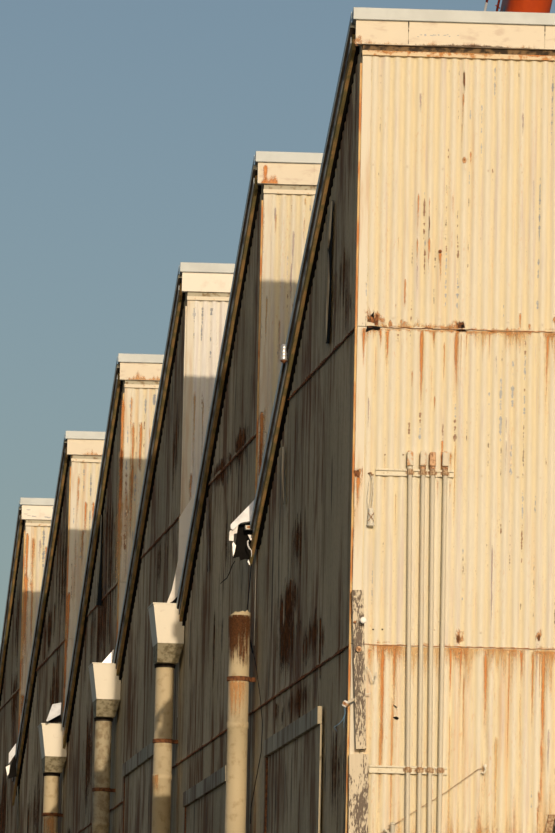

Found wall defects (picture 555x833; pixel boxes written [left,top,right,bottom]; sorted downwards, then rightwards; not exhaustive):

corrosion [287,315,555,400]
corrosion [85,402,150,669]
corrosion [0,533,35,722]
corrosion [36,521,70,709]
corrosion [213,615,251,671]
corrosion [230,681,244,709]
corrosion [248,579,349,722]
corrosion [369,630,554,766]